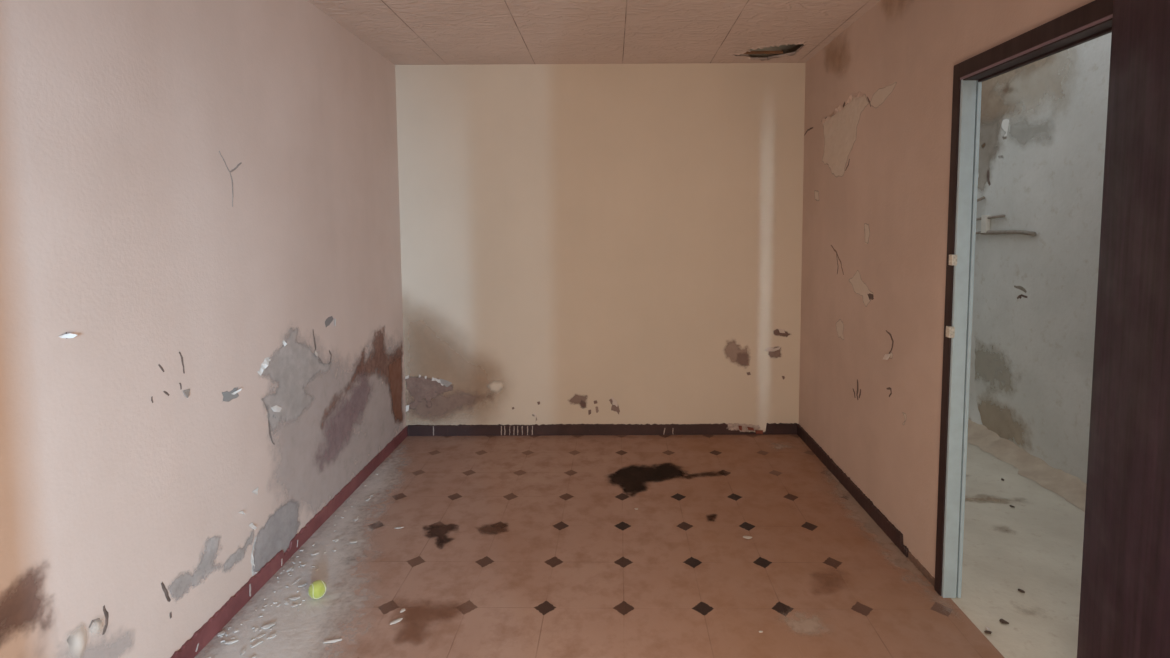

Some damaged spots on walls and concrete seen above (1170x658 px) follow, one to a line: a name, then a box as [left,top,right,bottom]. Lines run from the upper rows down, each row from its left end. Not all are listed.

crack [219,151,242,207]
peeling [257,316,336,445]
damp [320,321,489,469]
peeling [588,397,620,415]
peeling [161,498,358,656]